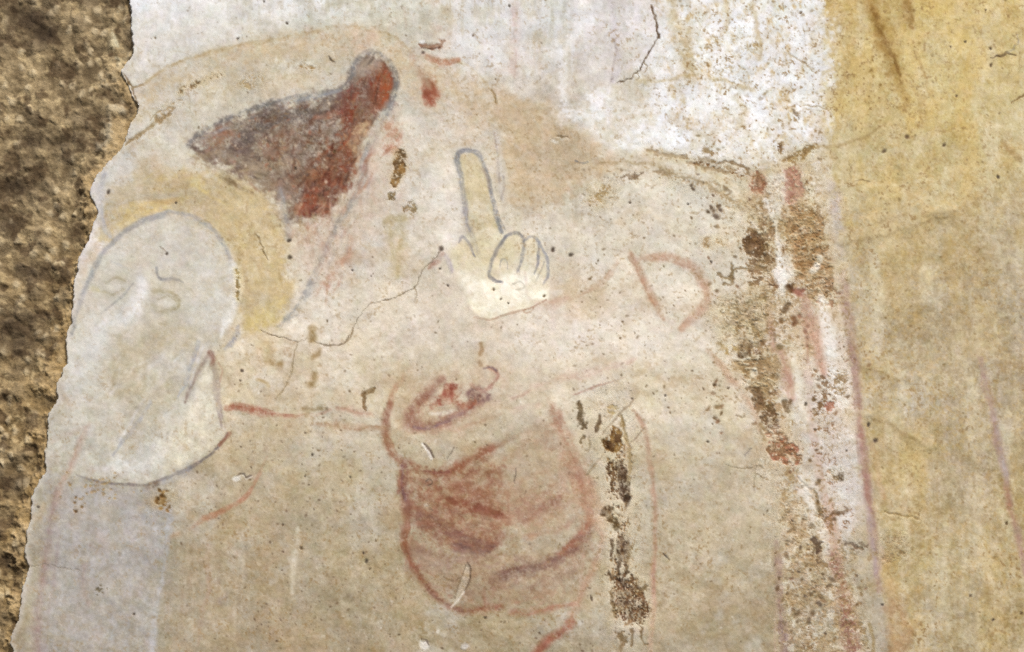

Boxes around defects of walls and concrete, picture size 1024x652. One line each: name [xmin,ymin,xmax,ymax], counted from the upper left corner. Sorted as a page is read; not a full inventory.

crack [616,4,661,85]
crack [259,251,440,401]
peeling [576,139,914,652]